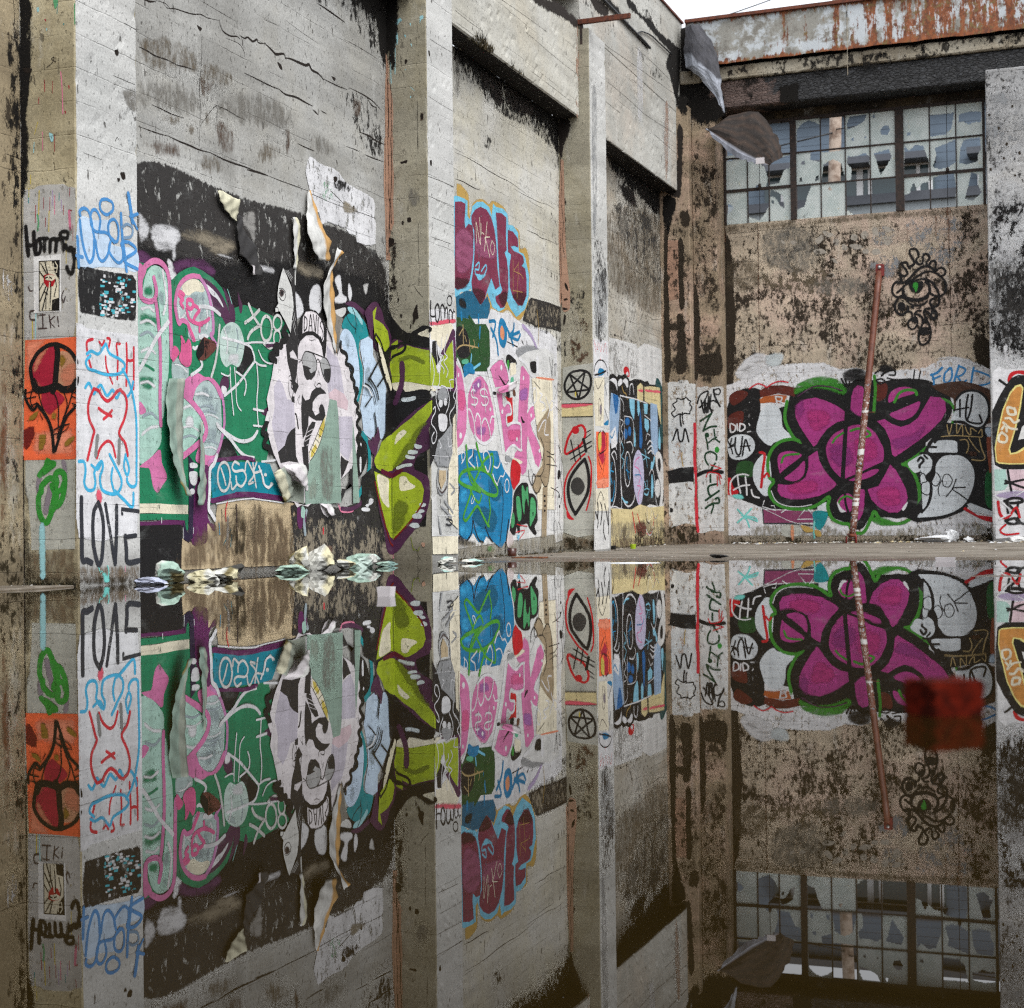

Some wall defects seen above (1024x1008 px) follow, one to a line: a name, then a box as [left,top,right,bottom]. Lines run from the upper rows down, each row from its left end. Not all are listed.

crack [138,0,384,191]
water stain [984,71,1024,178]
water stain [988,189,1024,359]